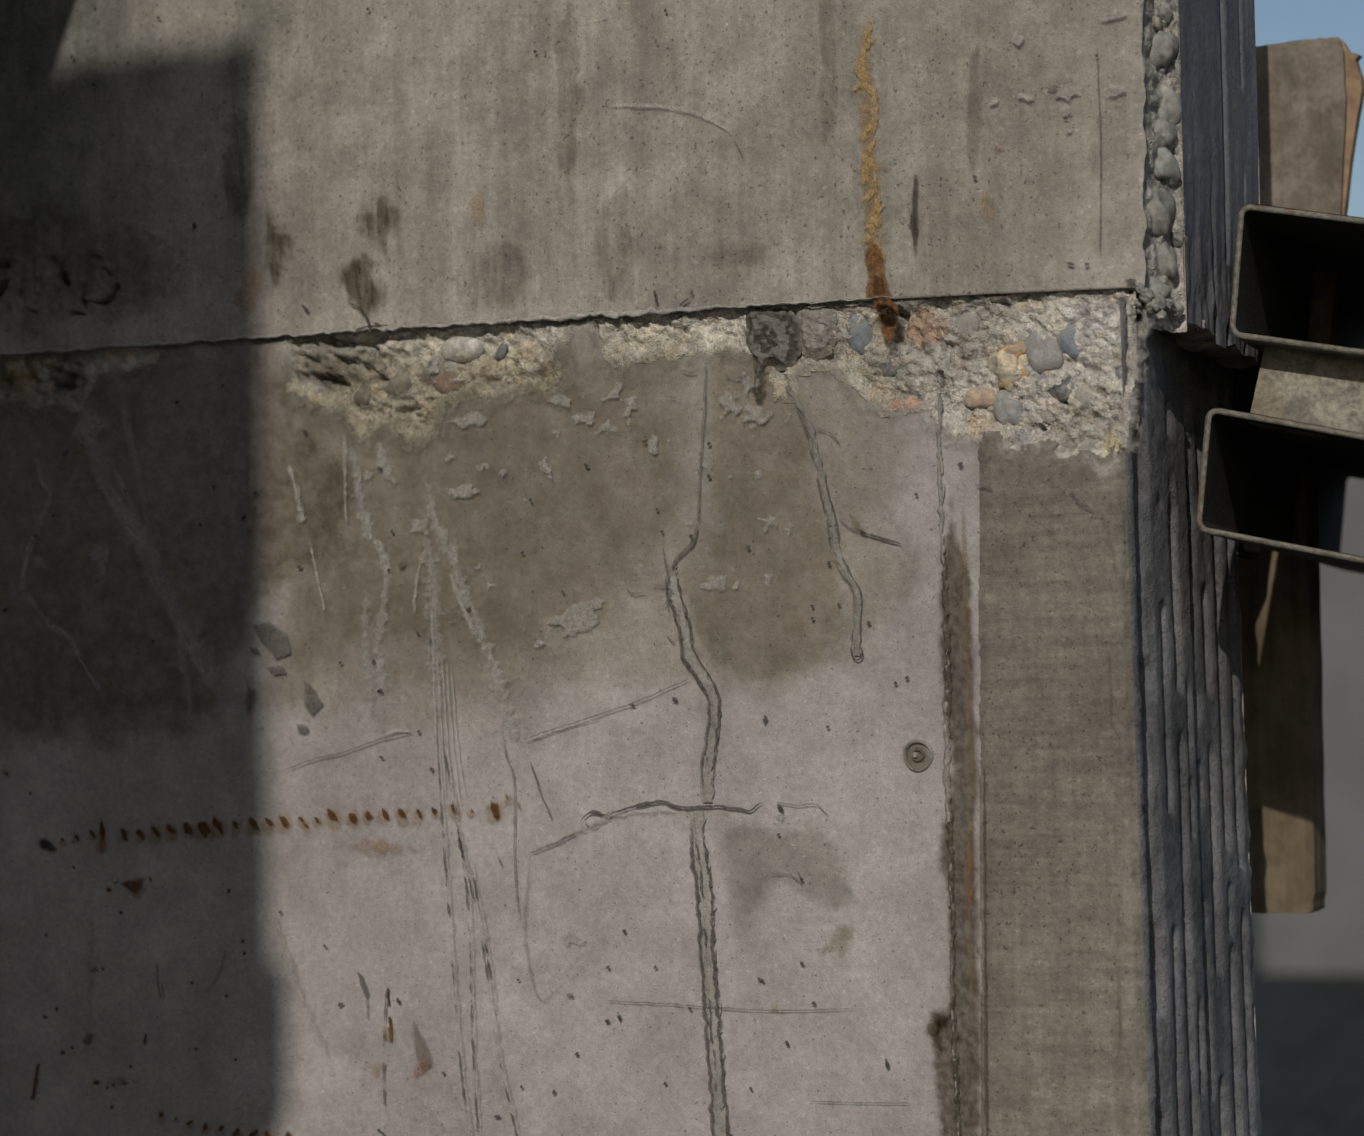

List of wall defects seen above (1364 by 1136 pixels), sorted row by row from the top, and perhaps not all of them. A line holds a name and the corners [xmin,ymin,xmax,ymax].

rust [853,17,898,343]
spalling [0,345,177,425]
spalling [270,289,1148,498]
crack [772,411,900,661]
peeling [547,590,602,636]
crack [292,370,847,1136]
rust [60,804,473,852]
rust [491,794,519,820]
rust [159,1113,270,1136]